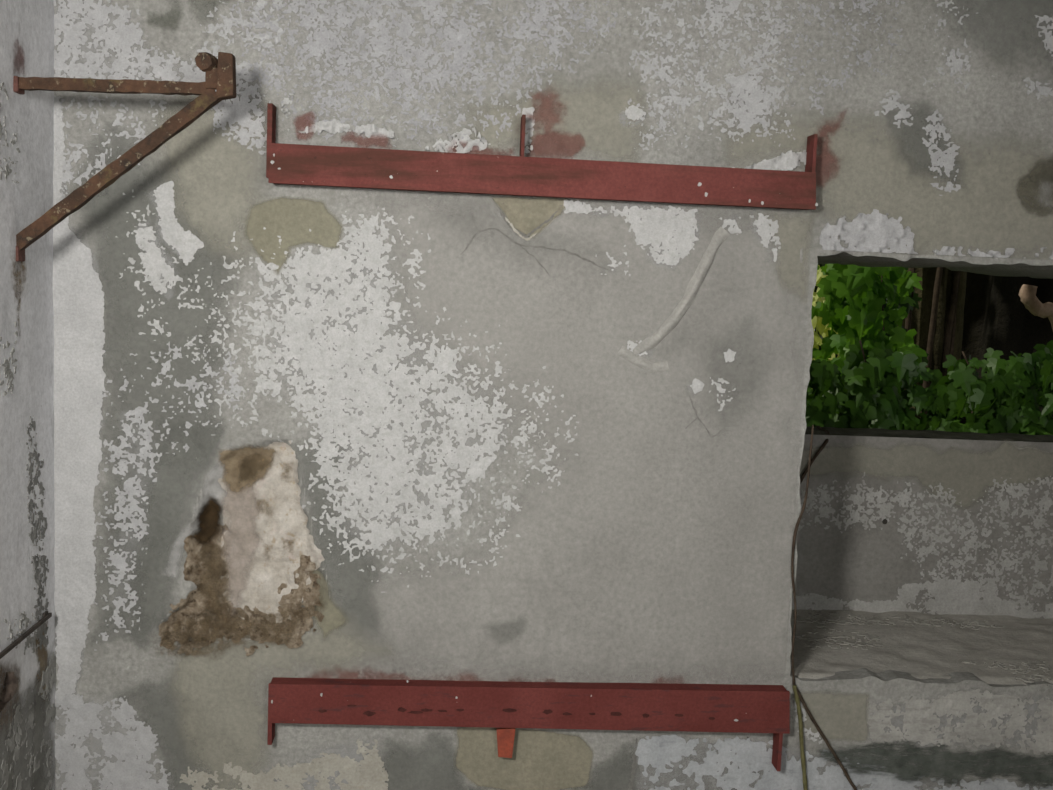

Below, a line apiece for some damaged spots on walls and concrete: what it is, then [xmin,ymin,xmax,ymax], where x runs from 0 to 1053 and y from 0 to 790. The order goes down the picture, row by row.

peeling [1035,15,1053,57]
peeling [53,92,167,206]
damp [1017,160,1053,215]
crack [460,216,609,275]
spalling [819,209,918,254]
spalling [933,246,1053,260]
peeling [0,181,579,790]
peeling [792,472,1053,619]
peeling [635,734,1053,790]